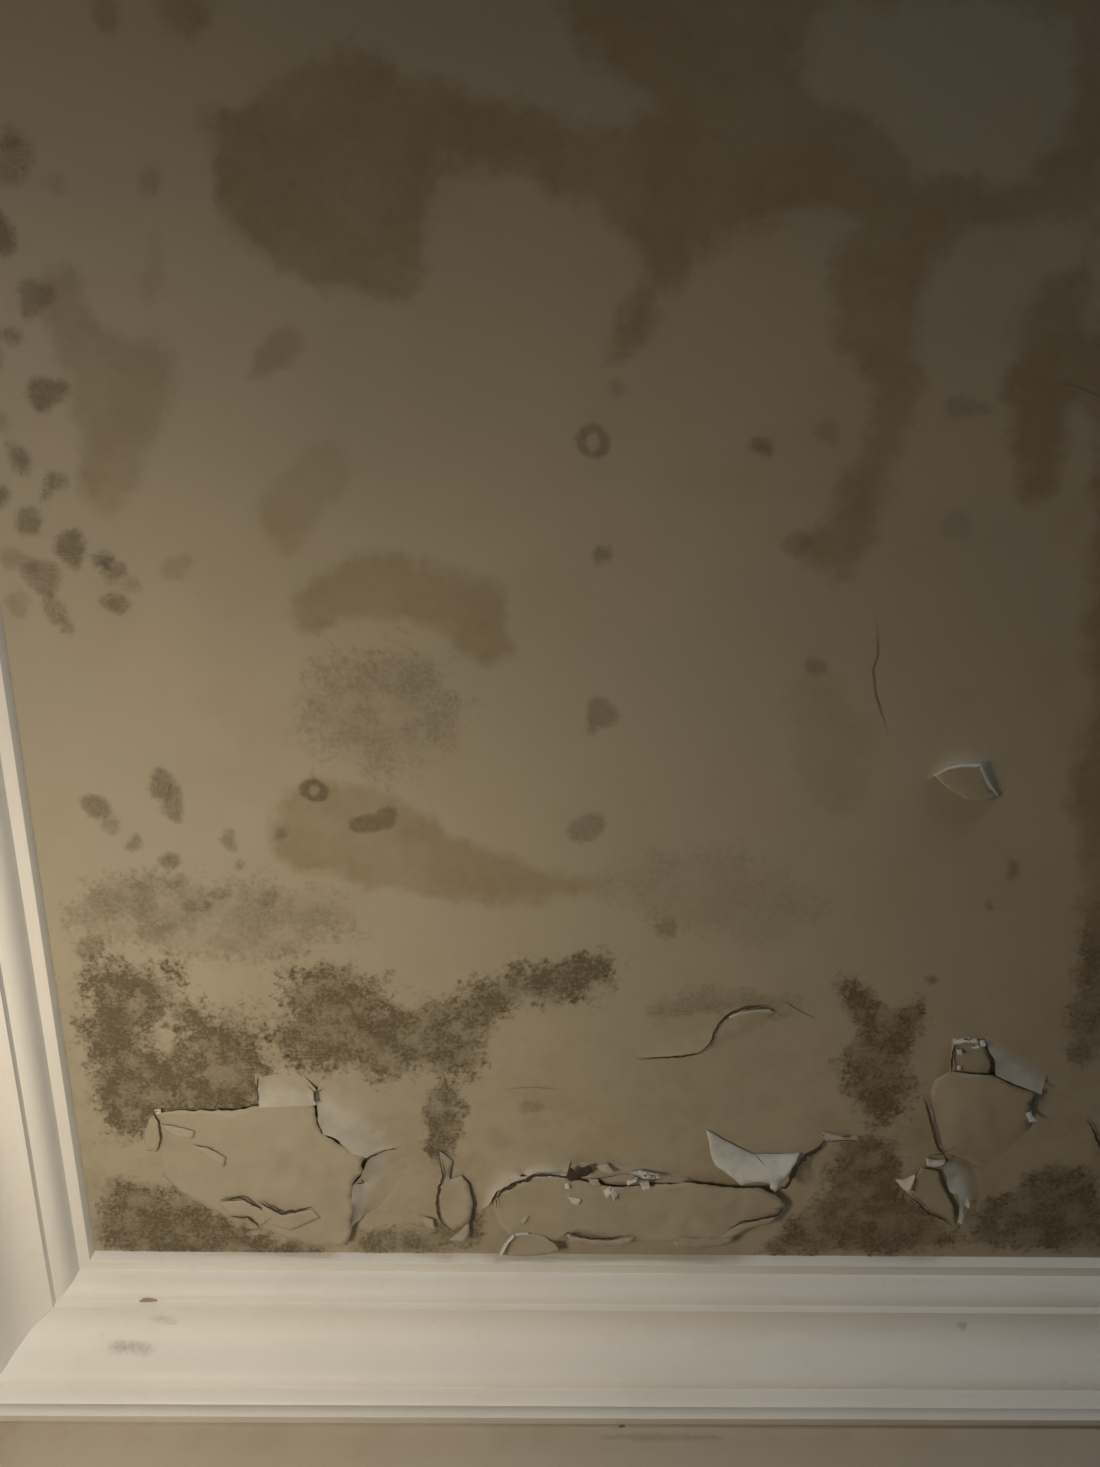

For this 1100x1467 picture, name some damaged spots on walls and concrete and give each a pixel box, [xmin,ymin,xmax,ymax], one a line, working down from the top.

damp [10,0,1100,1059]
damp [95,1179,321,1253]
peeling [143,1069,414,1247]
mould [70,950,615,1157]
peeling [413,1130,860,1257]
damp [765,979,1100,1257]
peeling [895,1037,1046,1227]